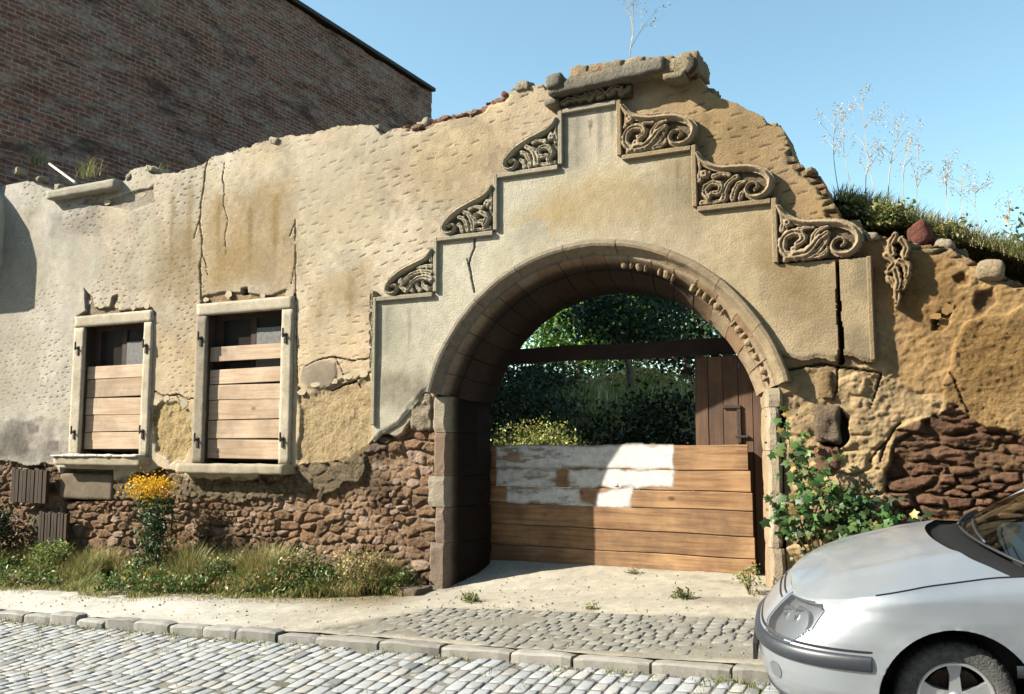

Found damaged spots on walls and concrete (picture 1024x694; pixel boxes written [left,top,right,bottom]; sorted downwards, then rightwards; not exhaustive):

crack [193,160,229,300]
crack [290,220,371,384]
crack [466,238,476,292]
peeling [297,370,371,395]
flaking render [0,394,444,586]
flaking render [884,405,1024,525]